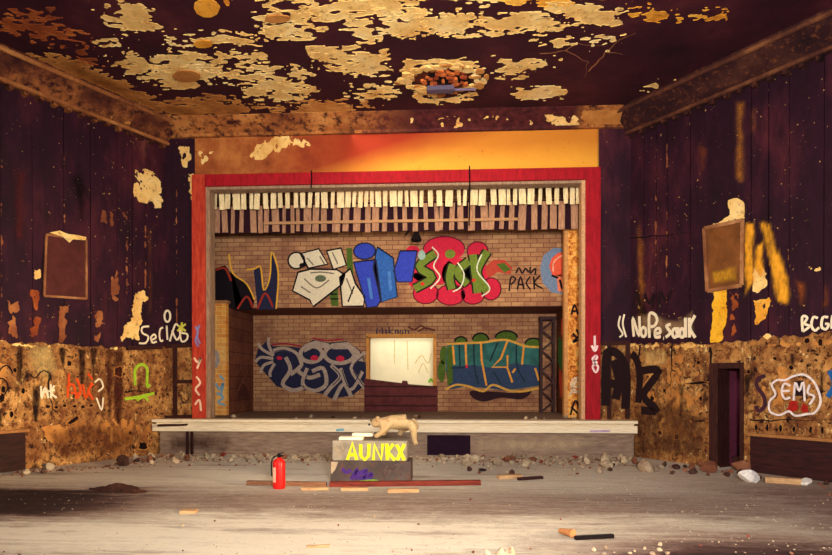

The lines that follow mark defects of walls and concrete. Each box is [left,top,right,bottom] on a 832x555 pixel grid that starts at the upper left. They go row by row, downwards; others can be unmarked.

peeling [0,0,729,116]
peeling [133,169,163,208]
peeling [178,146,213,200]
peeling [250,136,311,160]
peeling [110,242,148,350]
peeling [752,267,771,325]
spalling [0,363,17,404]
spalling [630,290,738,439]
spalling [772,357,794,409]
spalling [749,333,832,348]
spalling [41,404,94,446]
spalling [94,418,153,450]